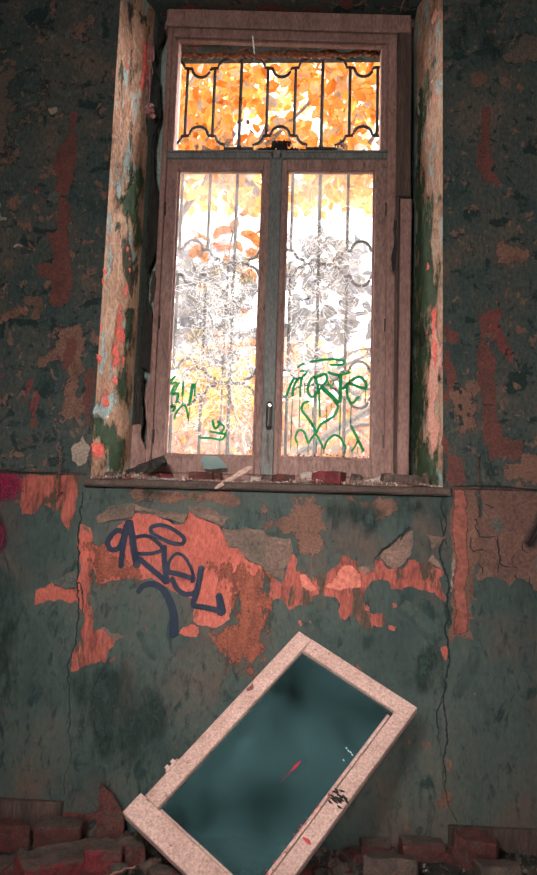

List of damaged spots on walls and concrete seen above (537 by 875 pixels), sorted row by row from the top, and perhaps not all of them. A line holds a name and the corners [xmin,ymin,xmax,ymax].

crack [0,469,85,794]
peeling [36,284,129,428]
peeling [3,307,537,679]
crack [435,485,537,825]